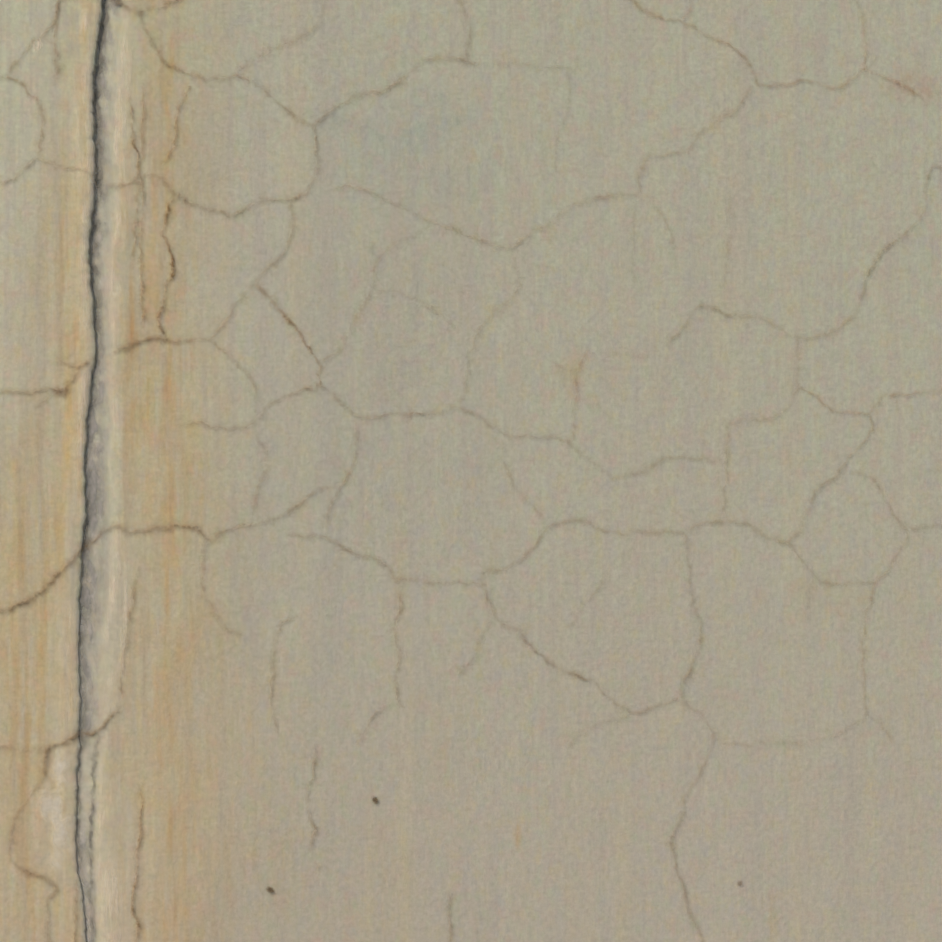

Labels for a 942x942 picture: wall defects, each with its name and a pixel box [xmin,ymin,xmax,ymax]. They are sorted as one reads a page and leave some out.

crack [90,0,117,332]
crack [165,206,174,277]
crack [70,365,106,741]
crack [76,766,95,942]